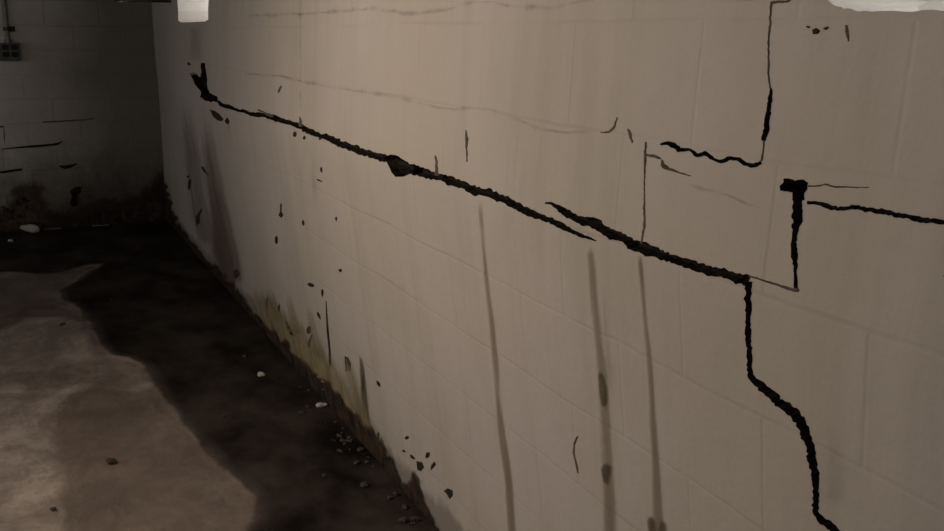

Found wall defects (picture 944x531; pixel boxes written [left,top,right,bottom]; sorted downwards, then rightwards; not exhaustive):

crack [0,118,94,173]
crack [202,0,944,531]
water stain [0,159,439,531]
water stain [500,426,513,531]
water stain [648,514,665,531]